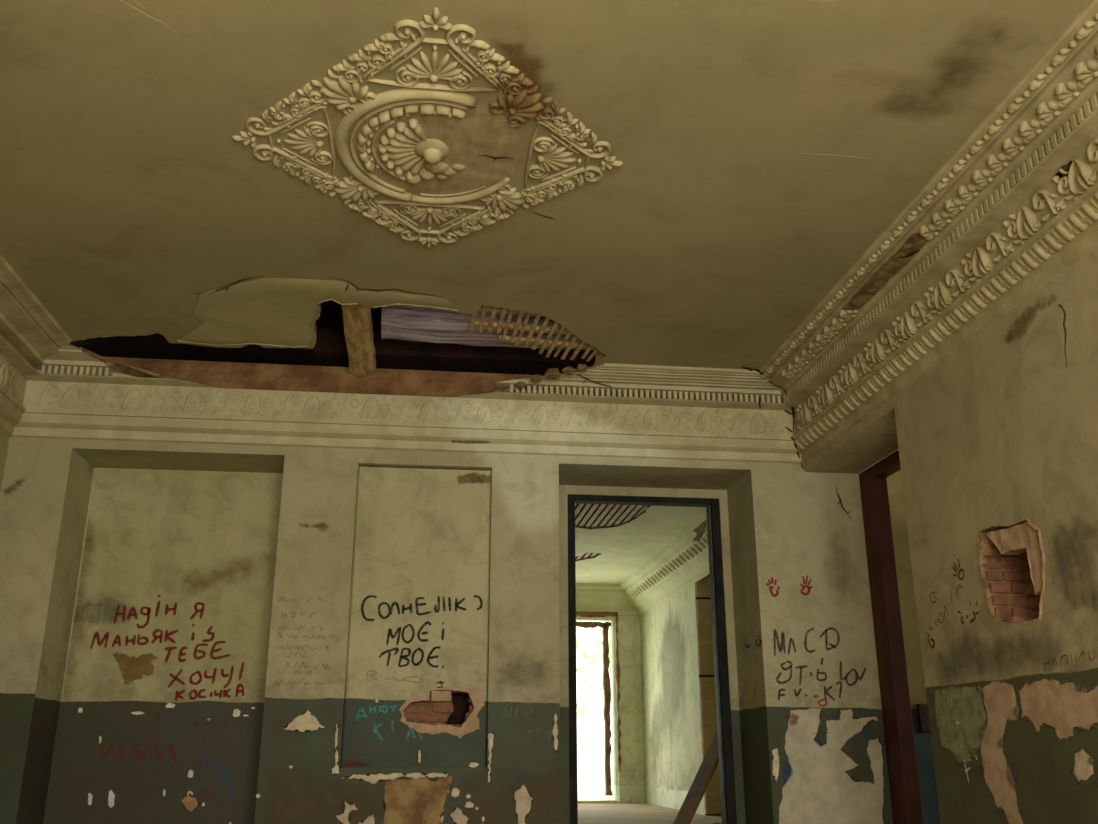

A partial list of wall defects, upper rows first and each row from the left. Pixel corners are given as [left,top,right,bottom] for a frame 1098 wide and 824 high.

spalling [316,300,344,329]
spalling [371,307,382,331]
crack [1057,304,1067,366]
flaking render [105,357,544,397]
spalling [976,517,1046,626]
peeling [113,650,159,685]
spalling [284,710,487,824]
spalling [399,686,495,782]
peeling [772,707,886,824]
peeling [935,679,1098,824]
peeling [514,785,534,824]